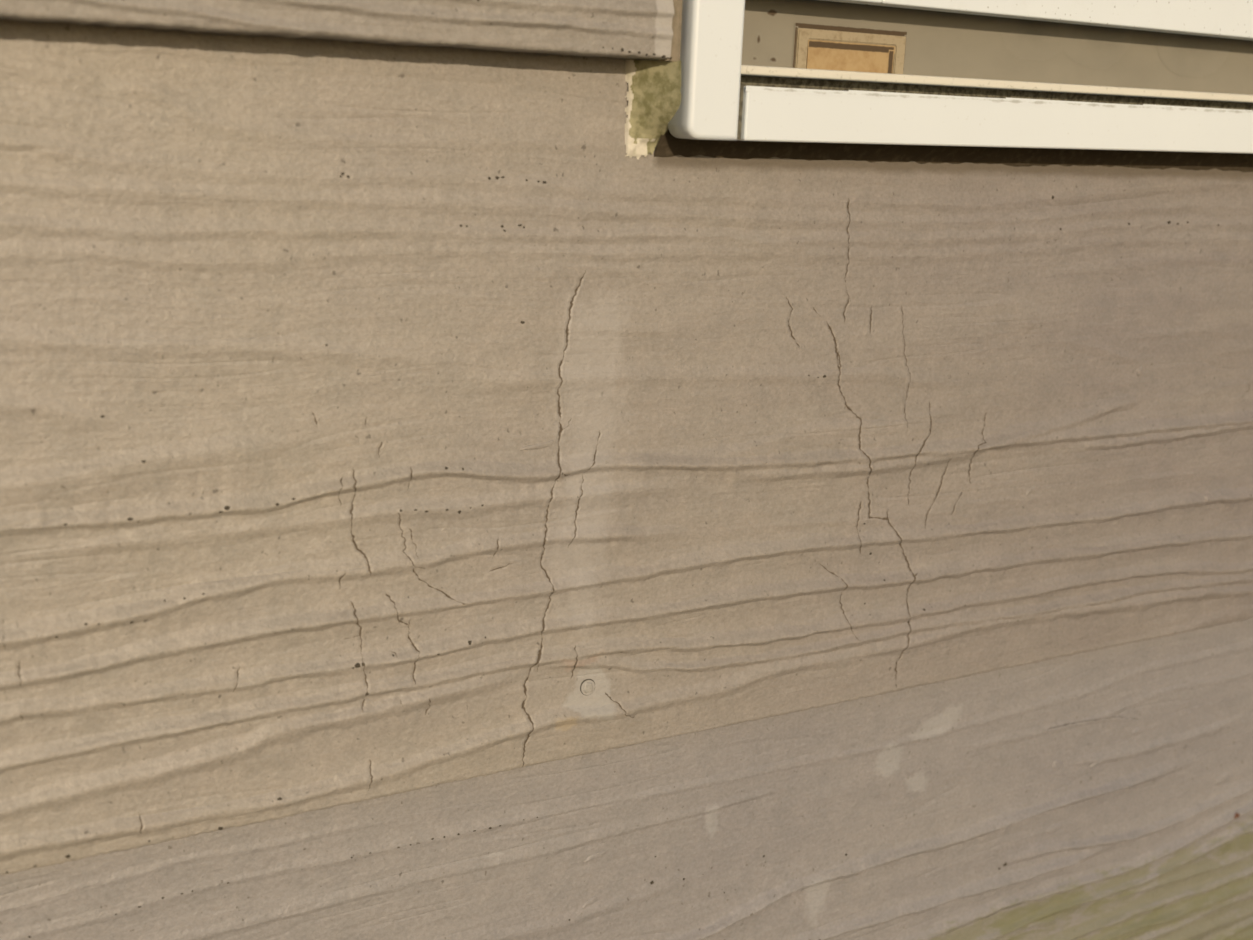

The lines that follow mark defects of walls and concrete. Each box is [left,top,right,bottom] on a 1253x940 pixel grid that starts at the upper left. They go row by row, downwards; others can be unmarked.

crack [338,417,431,715]
crack [398,469,465,605]
crack [491,272,608,766]
crack [786,202,986,687]